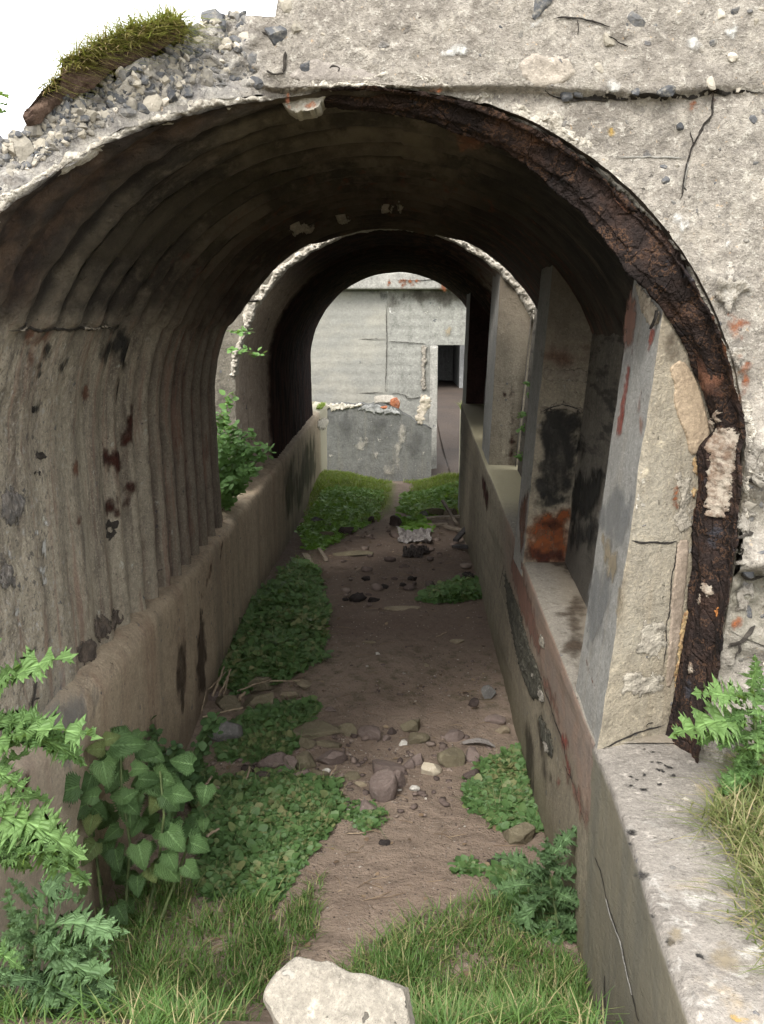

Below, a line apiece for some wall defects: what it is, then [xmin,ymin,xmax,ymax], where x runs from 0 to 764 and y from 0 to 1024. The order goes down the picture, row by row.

crack [545,89,761,200]
crack [9,323,119,333]
spalling [0,59,764,702]
rust [624,291,636,346]
rust [511,494,571,654]
spalling [538,716,553,758]
crack [537,666,585,823]
crack [595,858,639,1021]